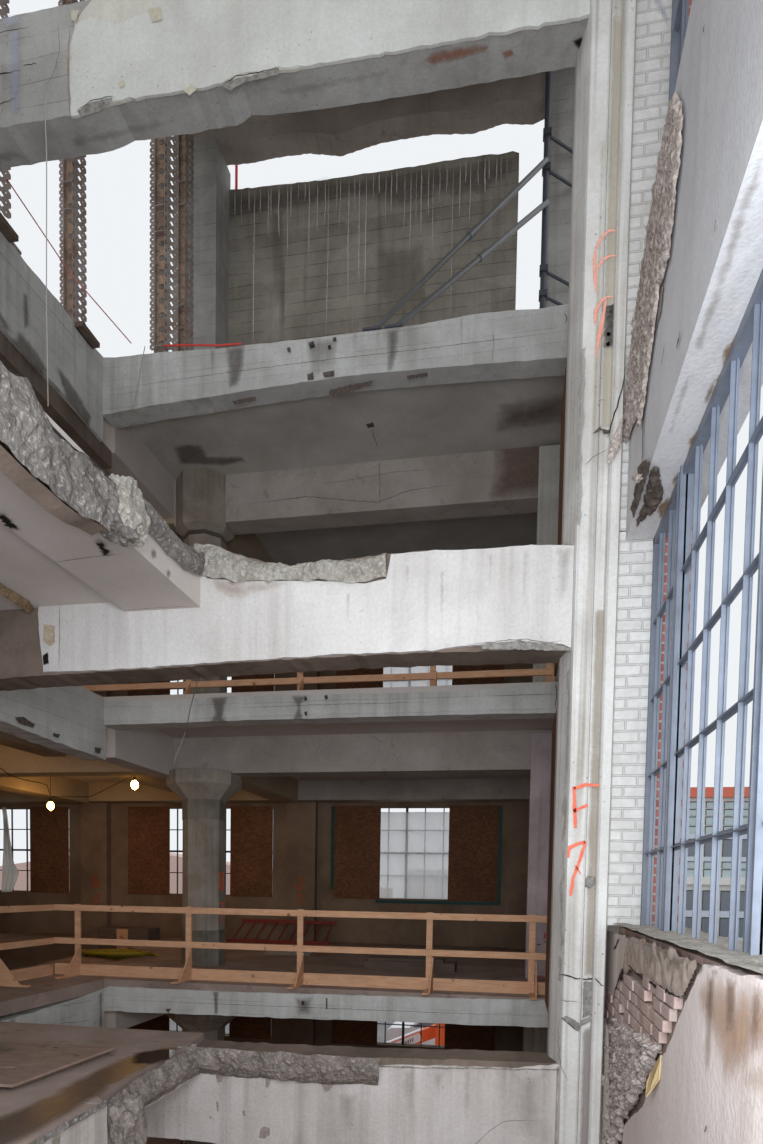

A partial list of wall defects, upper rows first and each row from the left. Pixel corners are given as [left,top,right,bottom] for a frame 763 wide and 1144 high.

damp [230,348,241,382]
damp [233,159,507,337]
spalling [594,91,683,527]
spalling [0,361,388,583]
spalling [30,1046,380,1144]
crack [559,938,682,1003]
spalling [558,930,683,1144]